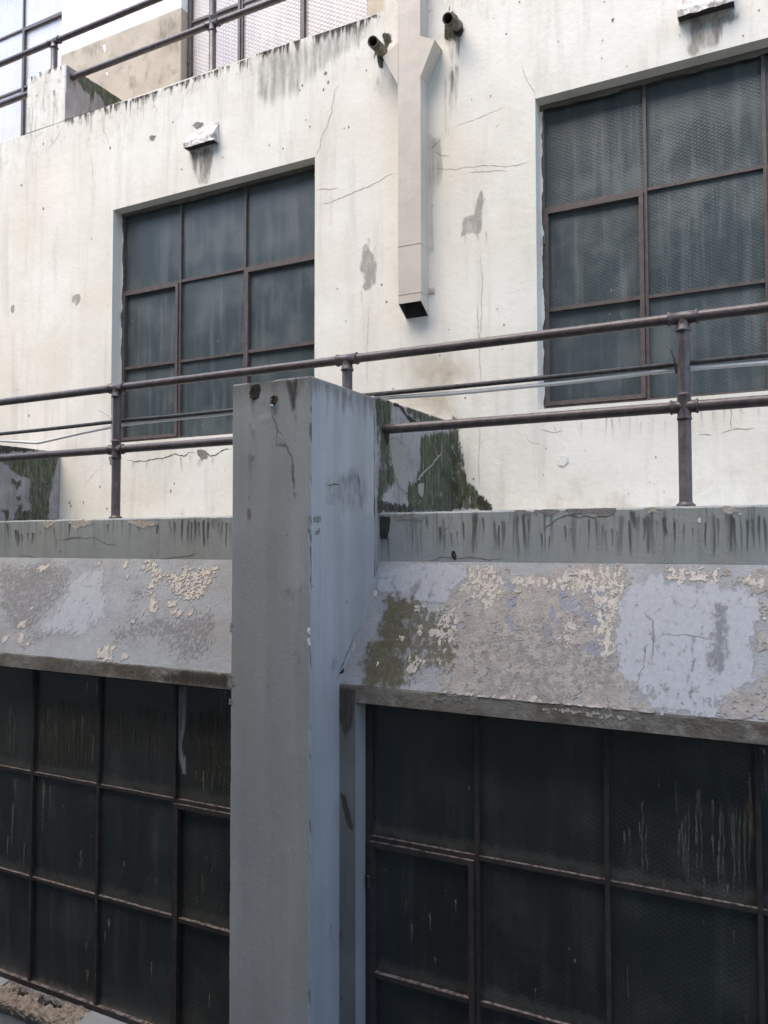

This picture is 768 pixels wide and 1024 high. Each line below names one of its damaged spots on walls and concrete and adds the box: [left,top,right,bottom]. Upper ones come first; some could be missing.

damp [444,6,464,48]
damp [64,14,377,121]
crack [430,106,530,173]
crack [319,173,396,204]
spalling [461,191,483,236]
damp [0,445,45,453]
crack [129,449,227,462]
damp [378,500,412,546]
peeling [123,559,219,624]
peeling [406,555,655,721]
crack [633,610,713,685]
peeling [717,677,768,722]